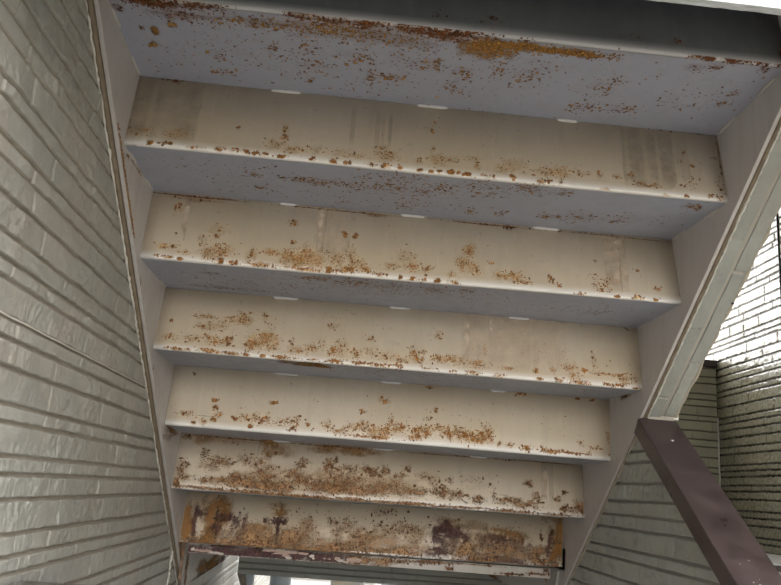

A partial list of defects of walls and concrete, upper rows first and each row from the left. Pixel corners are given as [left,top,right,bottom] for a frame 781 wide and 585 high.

rust [113,0,633,114]
rust [564,75,644,126]
rust [685,51,781,82]
rust [118,124,152,238]
rust [154,126,665,229]
rust [677,148,726,211]
rust [153,223,533,301]
rust [164,311,514,389]
rust [531,345,641,401]
peeling [257,549,362,563]